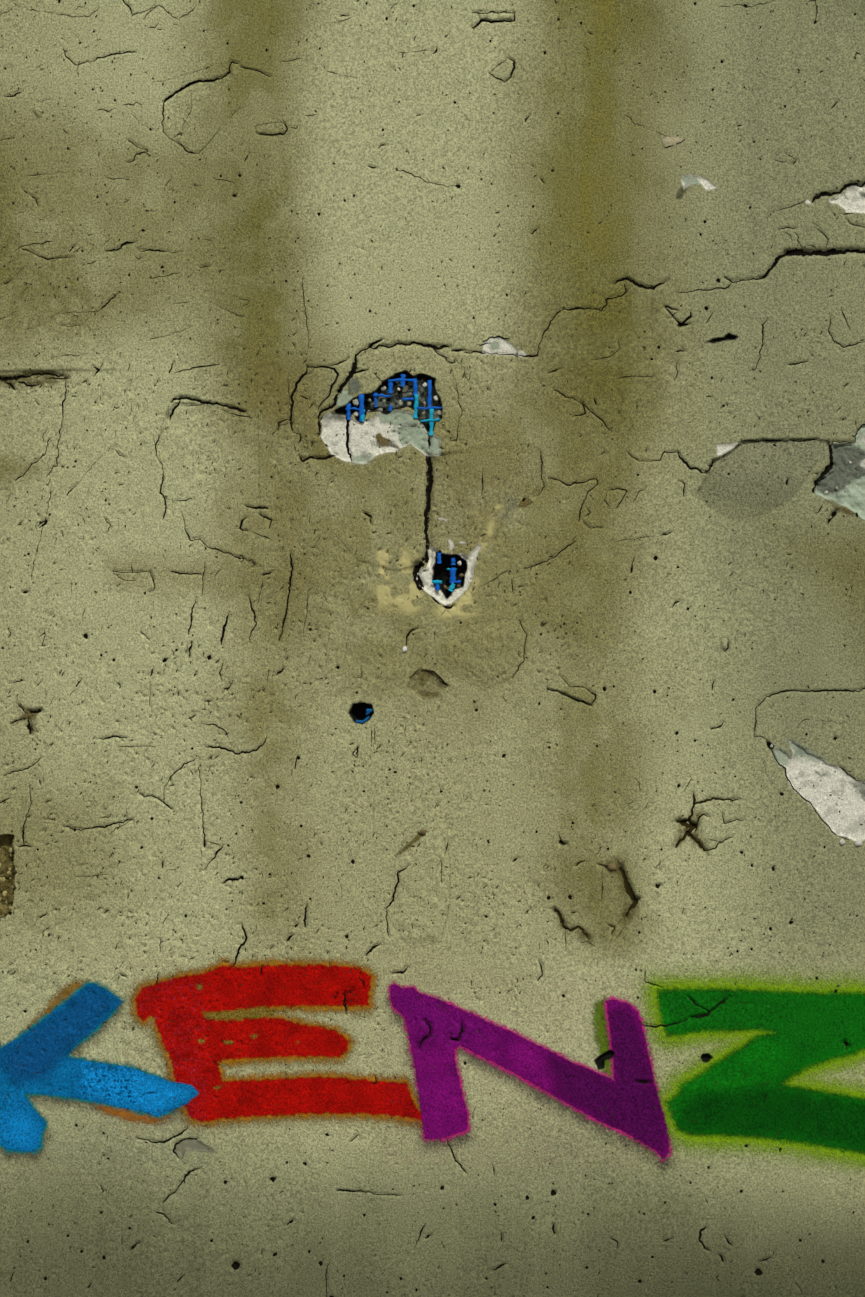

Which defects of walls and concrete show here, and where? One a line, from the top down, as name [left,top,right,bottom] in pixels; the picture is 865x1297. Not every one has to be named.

crack [0,0,195,65]
crack [398,10,515,54]
crack [98,58,356,182]
crack [369,144,453,187]
spalling [829,186,865,213]
peeling [321,370,543,606]
peeling [697,425,865,520]
crack [548,675,597,706]
crack [537,688,865,981]
spalling [775,733,865,841]